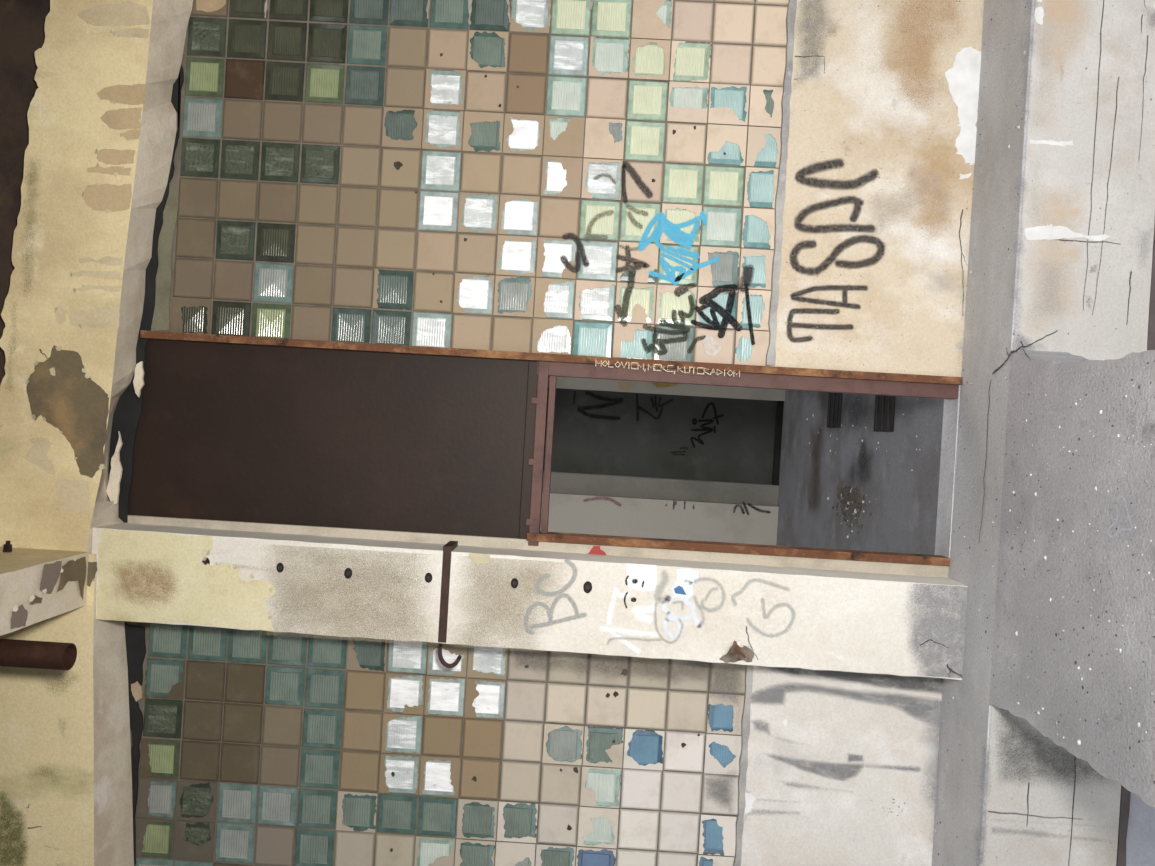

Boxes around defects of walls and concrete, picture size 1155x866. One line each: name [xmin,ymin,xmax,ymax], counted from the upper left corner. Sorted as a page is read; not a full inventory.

damp [791,0,984,132]
peeling [945,47,981,179]
peeling [11,63,275,865]